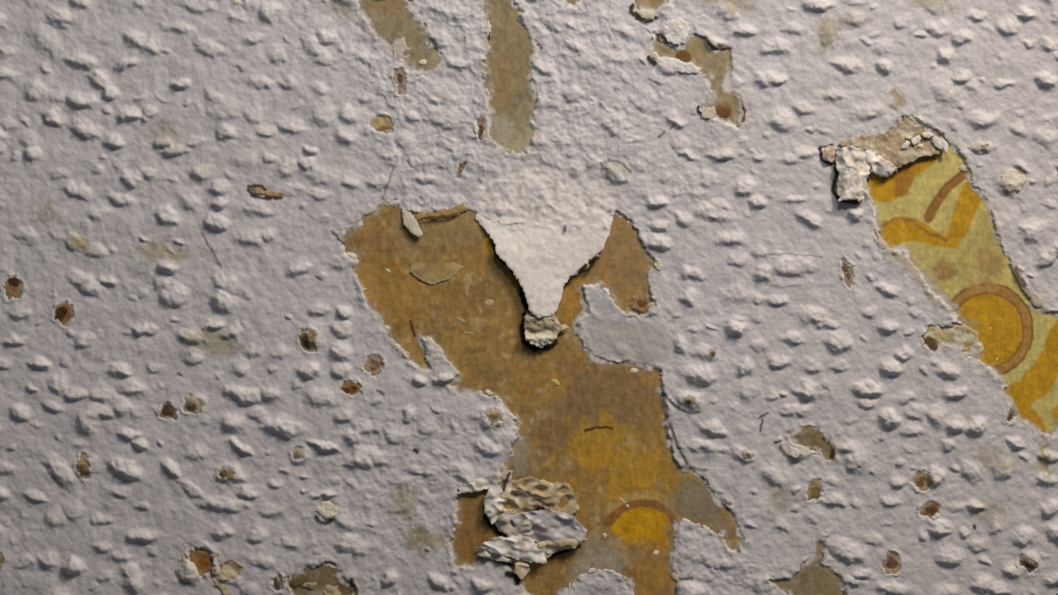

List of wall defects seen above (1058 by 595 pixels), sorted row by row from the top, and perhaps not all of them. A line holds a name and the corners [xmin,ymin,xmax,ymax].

peeling [341,0,749,595]
peeling [818,109,1058,438]
peeling [779,423,843,462]
spalling [175,547,244,595]
peeling [269,558,362,595]
peeling [769,535,849,595]